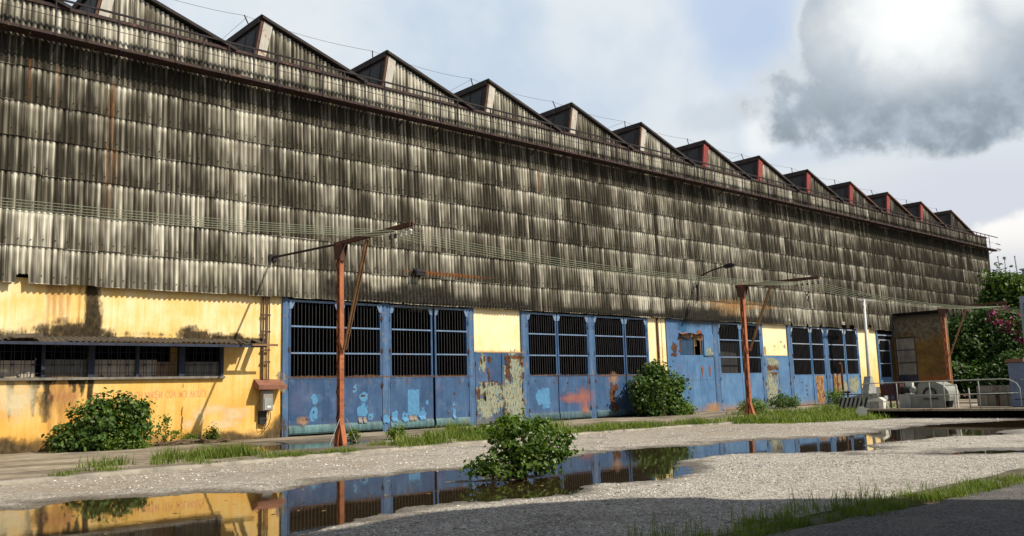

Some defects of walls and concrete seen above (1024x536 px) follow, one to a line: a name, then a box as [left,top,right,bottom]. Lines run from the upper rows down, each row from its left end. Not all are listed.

water stain [0,285,131,422]
water stain [177,326,265,344]
peeling [305,394,323,422]
peeling [475,349,576,421]
peeling [764,341,786,408]